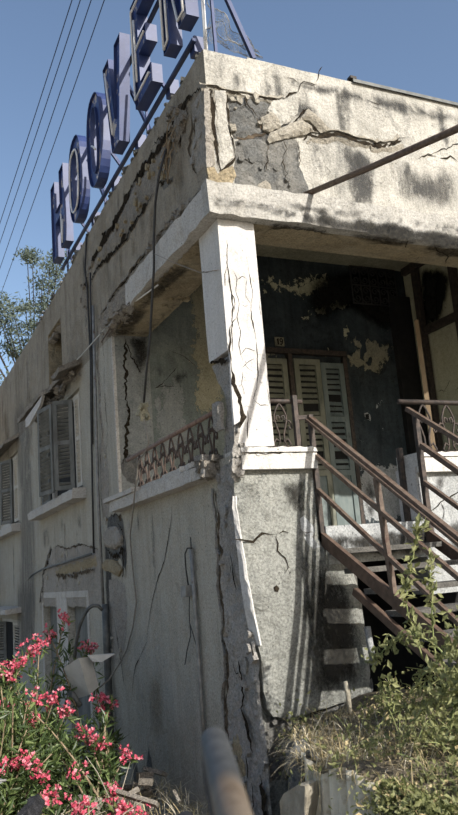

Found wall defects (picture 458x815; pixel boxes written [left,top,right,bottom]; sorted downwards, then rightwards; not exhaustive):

flaking render [79,89,309,317]
crack [84,67,458,285]
leakage [310,87,363,127]
leakage [253,148,458,257]
leakage [377,98,448,144]
crack [122,337,142,462]
crack [156,244,300,456]
peeling [343,325,393,373]
flaking render [43,512,127,664]
flaking render [101,245,346,815]
crack [211,488,289,815]
leakage [303,548,357,690]